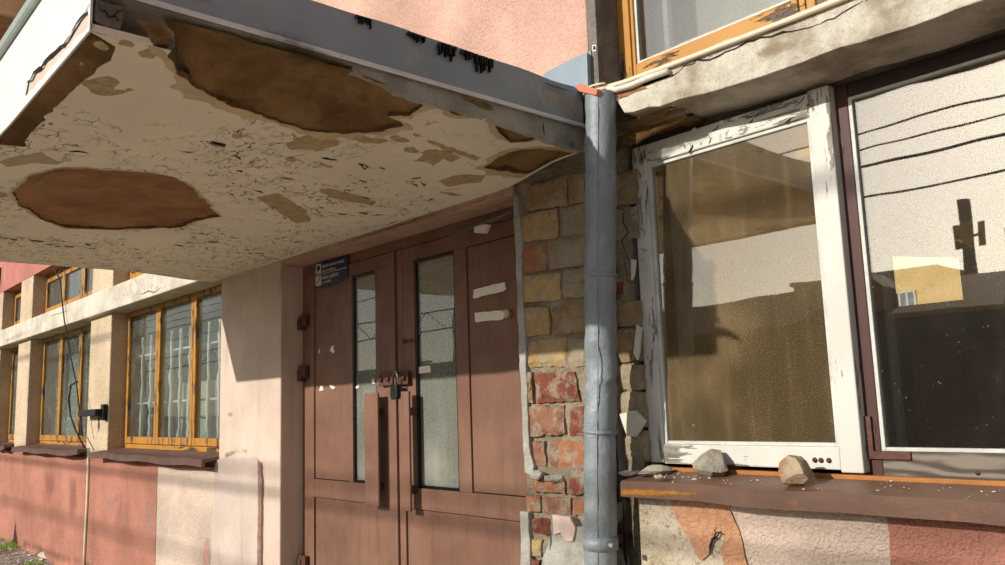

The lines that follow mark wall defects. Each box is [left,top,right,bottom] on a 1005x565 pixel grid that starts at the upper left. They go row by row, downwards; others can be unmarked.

leakage [0,16,13,41]
crack [22,7,88,90]
peeling [677,93,811,153]
flaking render [0,0,586,565]
flaking render [617,489,749,565]